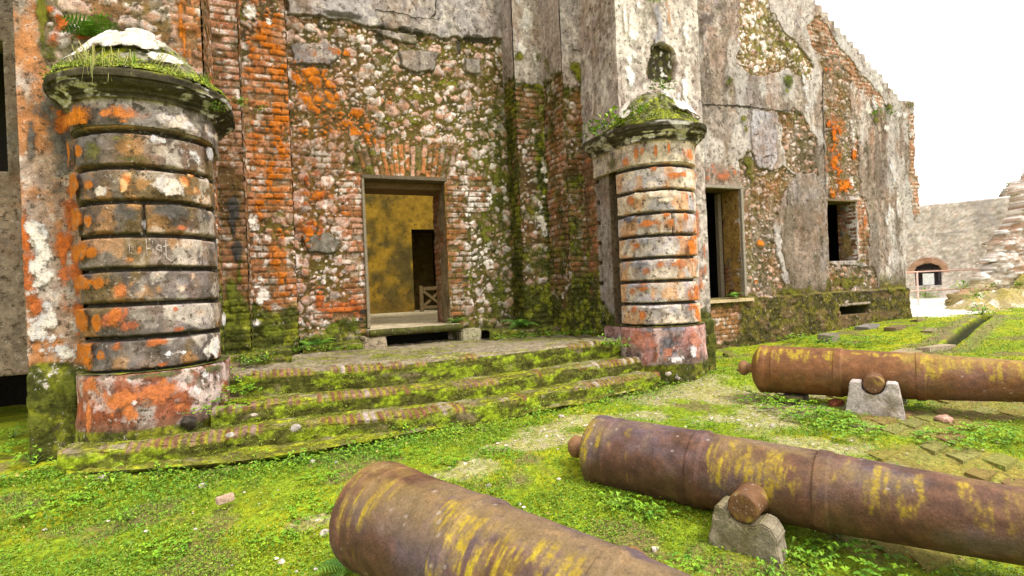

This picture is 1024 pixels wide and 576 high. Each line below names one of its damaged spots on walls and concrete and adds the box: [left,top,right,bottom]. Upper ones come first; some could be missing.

flaking render [286,0,502,76]
flaking render [736,0,884,298]
flaking render [907,114,920,215]
damp [114,195,309,327]
flaking render [298,232,341,255]